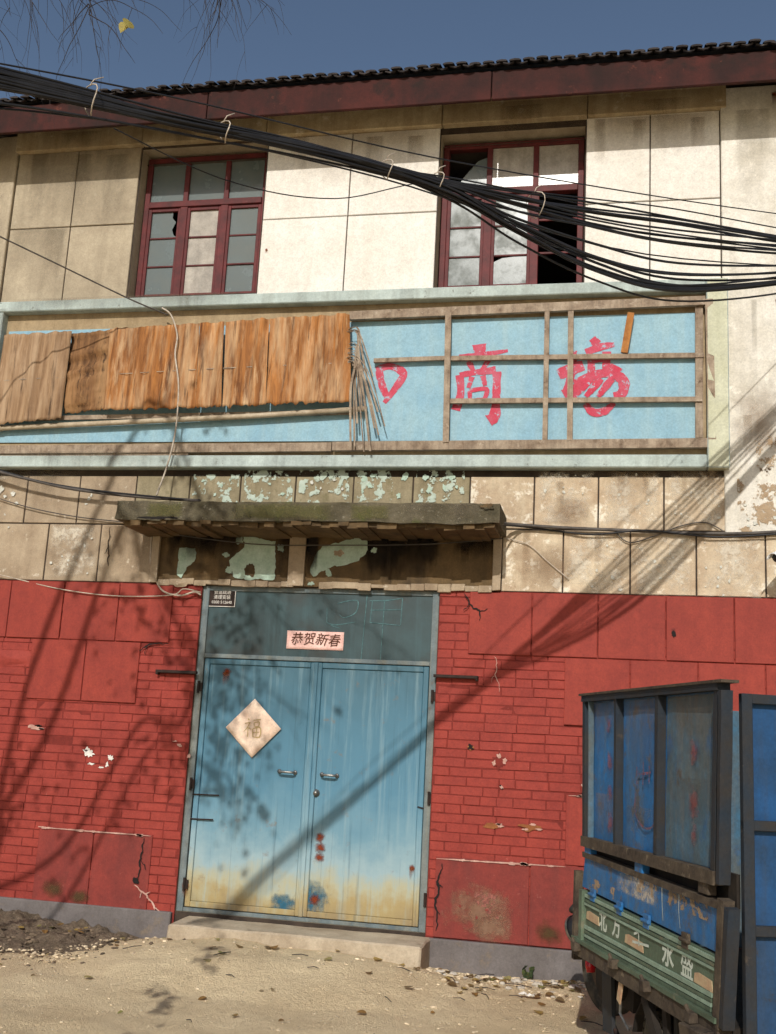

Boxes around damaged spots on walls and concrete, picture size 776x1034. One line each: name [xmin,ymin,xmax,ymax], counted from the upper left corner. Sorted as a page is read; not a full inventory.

peeling [192,470,465,503]
peeling [705,436,776,596]
peeling [177,547,196,578]
peeling [222,537,284,580]
peeling [308,538,377,586]
peeling [83,746,114,768]
crack [133,839,159,911]
rust [274,896,294,909]
rust [308,886,325,910]
crack [434,865,443,929]